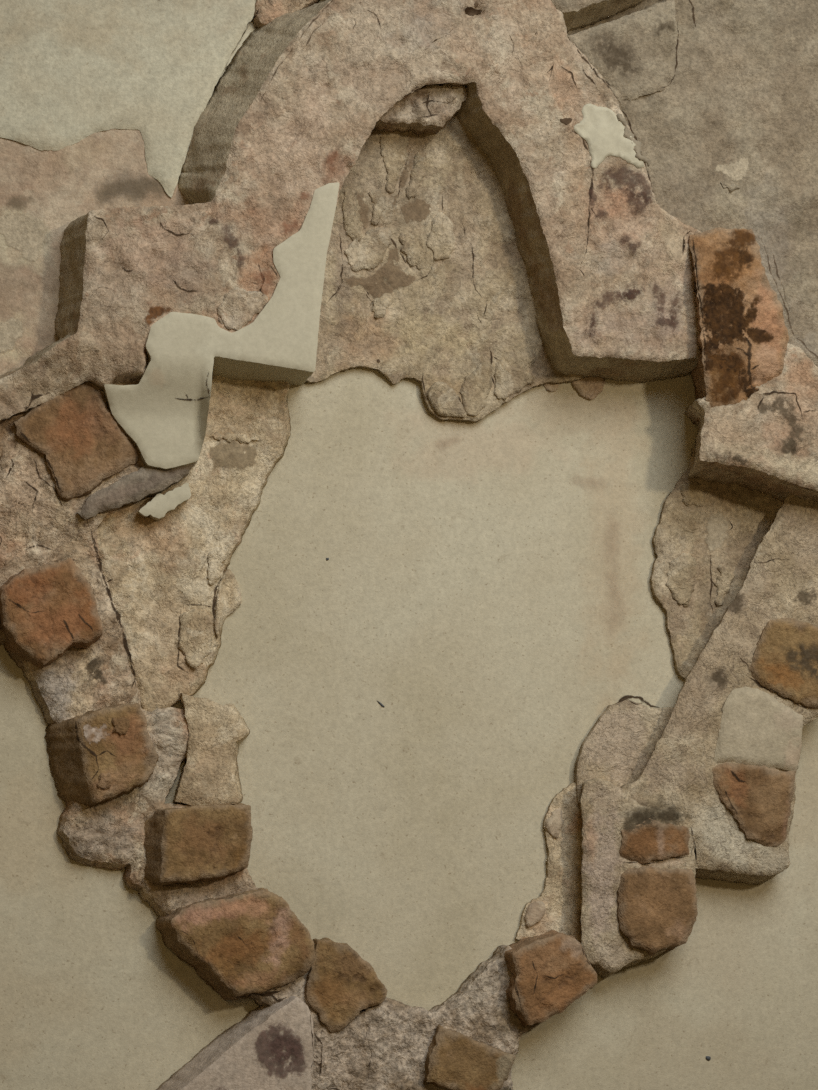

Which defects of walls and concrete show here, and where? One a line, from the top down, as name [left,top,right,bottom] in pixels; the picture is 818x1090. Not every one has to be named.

spalling [551,0,643,33]
spalling [574,104,650,169]
spalling [715,157,749,193]
spalling [342,130,456,319]
spalling [217,287,268,330]
rust [699,230,774,404]
peeling [427,359,559,418]
peeling [572,377,605,400]
spalling [210,432,260,469]
crack [0,392,136,686]
spalling [83,717,130,744]
leakage [256,1024,305,1077]